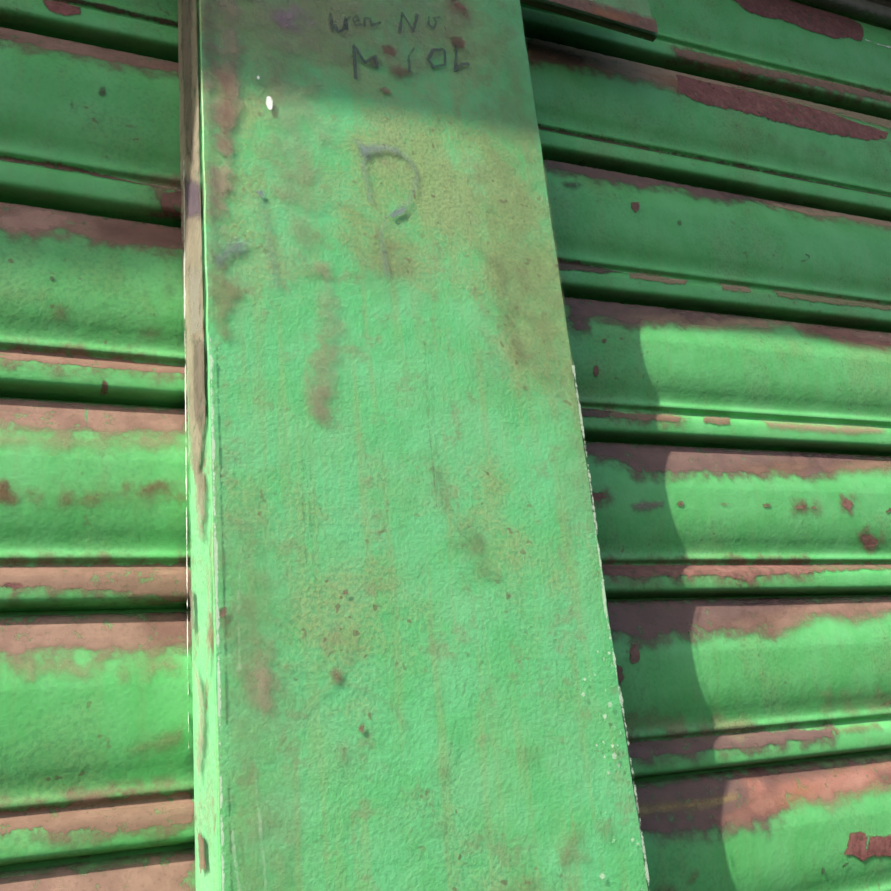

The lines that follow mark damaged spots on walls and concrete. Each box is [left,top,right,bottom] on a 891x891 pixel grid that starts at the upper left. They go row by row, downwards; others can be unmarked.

peeling [43,0,81,16]
peeling [734,0,891,48]
peeling [677,75,891,141]
peeling [842,831,891,867]